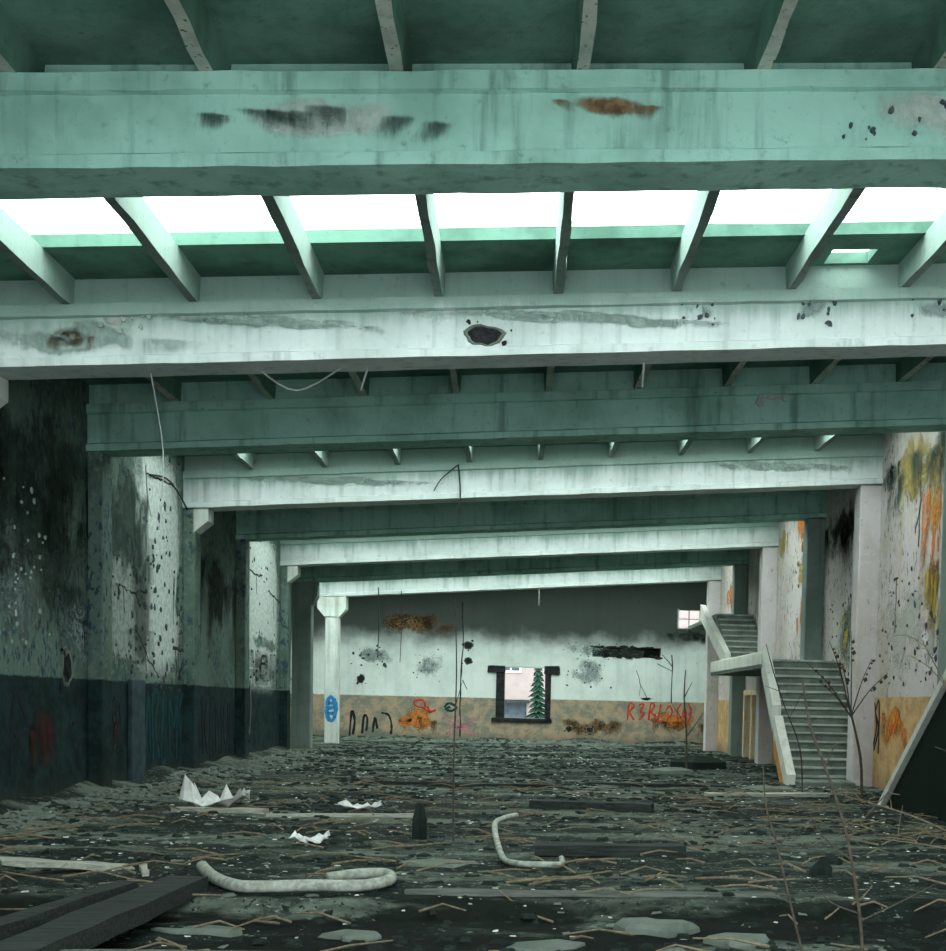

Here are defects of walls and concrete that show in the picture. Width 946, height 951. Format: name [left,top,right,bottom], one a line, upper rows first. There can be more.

corrosion [579,98,658,114]
corrosion [49,329,94,346]
spalling [463,319,512,346]
leakage [0,407,88,600]
leakage [112,461,149,582]